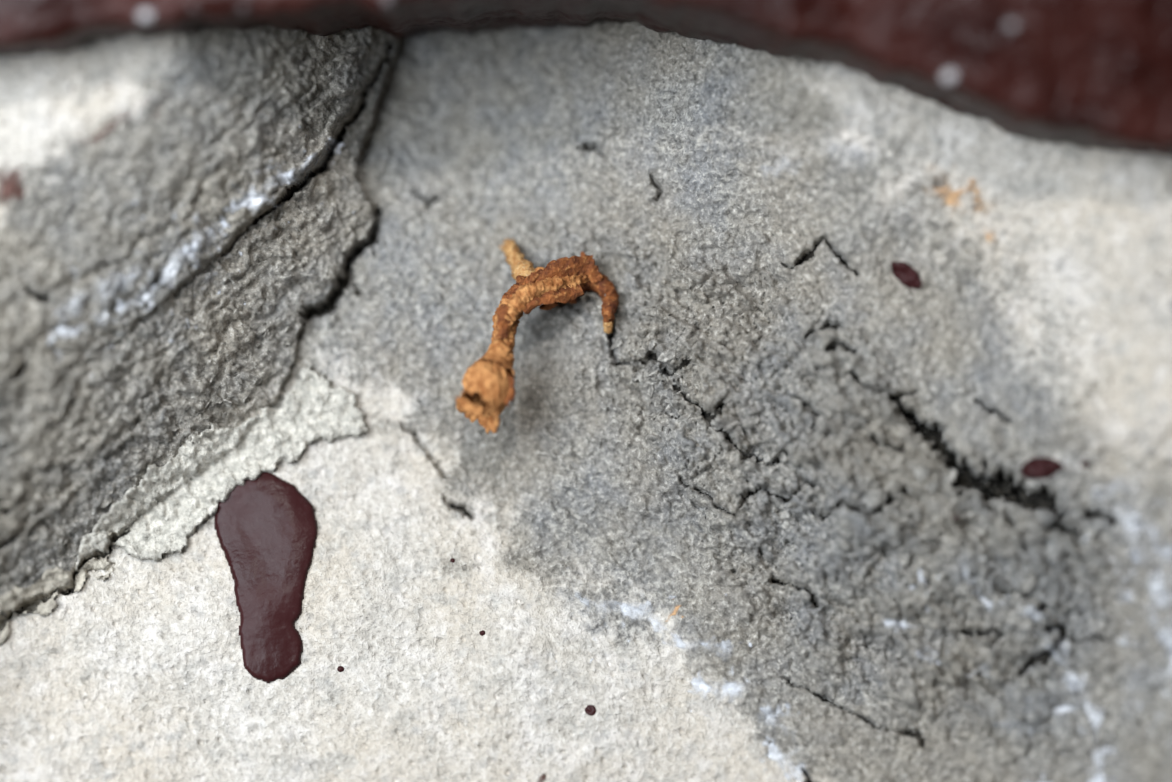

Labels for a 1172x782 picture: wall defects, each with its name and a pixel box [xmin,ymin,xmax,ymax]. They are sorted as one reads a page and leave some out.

crack [260,44,392,218]
damp [49,327,79,343]
peeling [0,366,369,645]
damp [141,171,294,307]
crack [303,212,381,321]
spalling [630,340,683,408]
spalling [769,443,791,491]
spalling [787,368,957,540]
crack [808,323,1115,552]
spalling [957,527,1050,680]